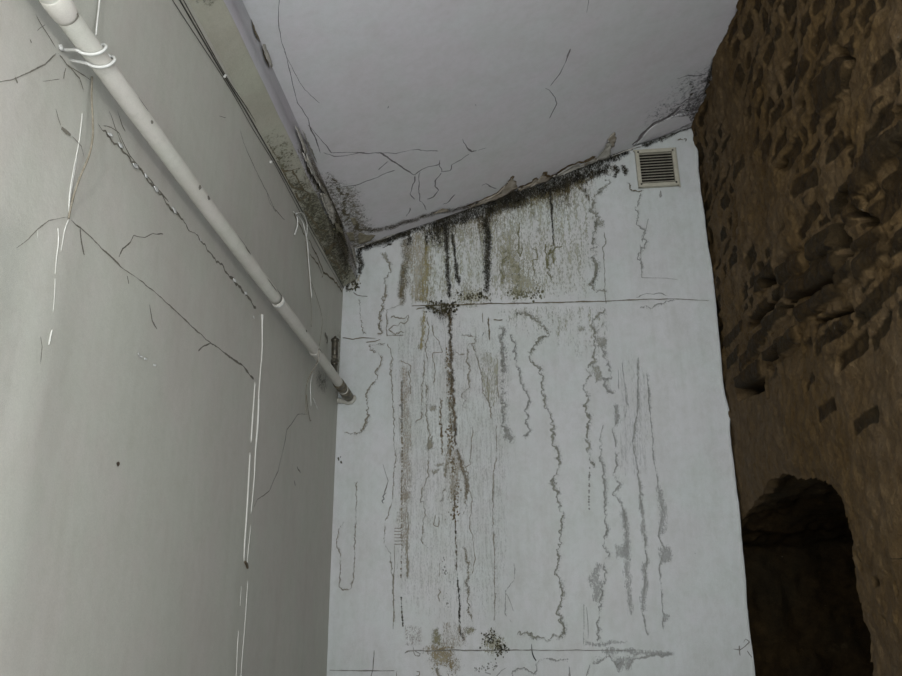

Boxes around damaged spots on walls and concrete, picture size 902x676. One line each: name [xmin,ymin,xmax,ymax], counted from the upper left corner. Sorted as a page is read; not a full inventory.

crack [0,17,89,88]
crack [242,138,368,297]
crack [278,0,485,216]
flaking render [468,132,642,209]
crack [545,49,571,118]
leakage [642,55,715,148]
crack [17,217,254,380]
leakage [267,141,673,676]